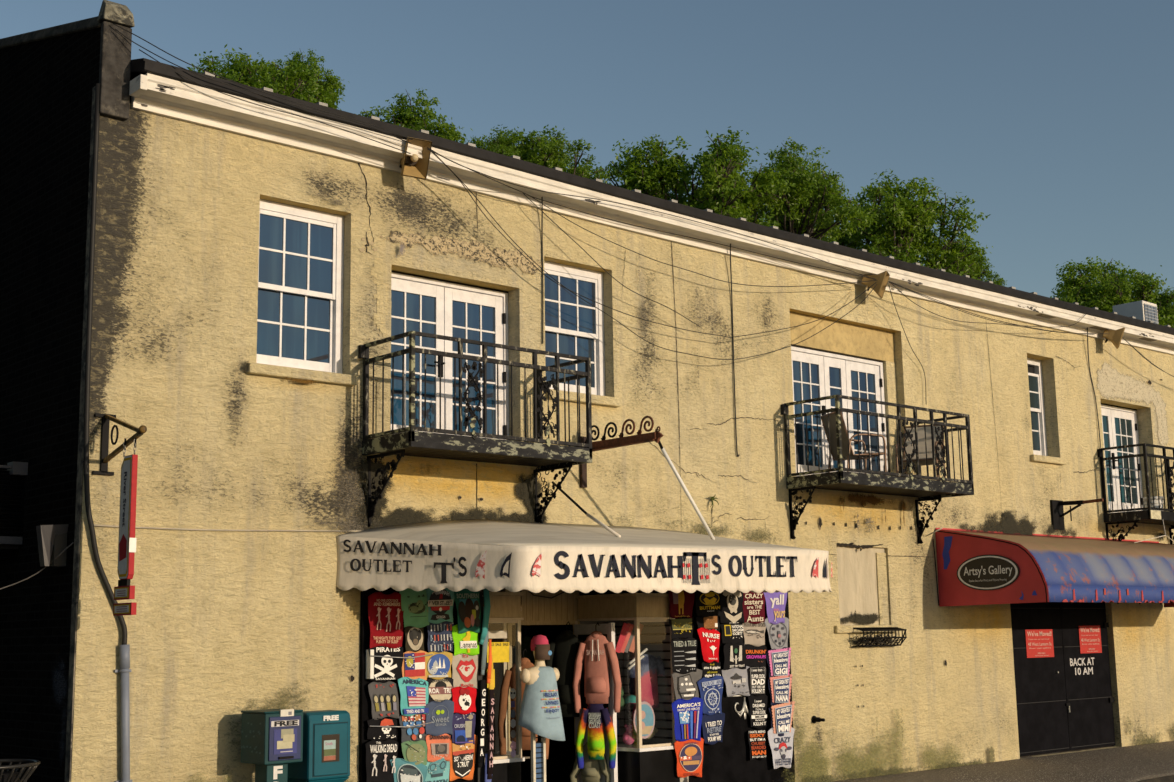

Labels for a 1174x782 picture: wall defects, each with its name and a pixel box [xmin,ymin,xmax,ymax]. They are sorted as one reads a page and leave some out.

crack [358,163,377,255]
leakage [960,510,1077,538]